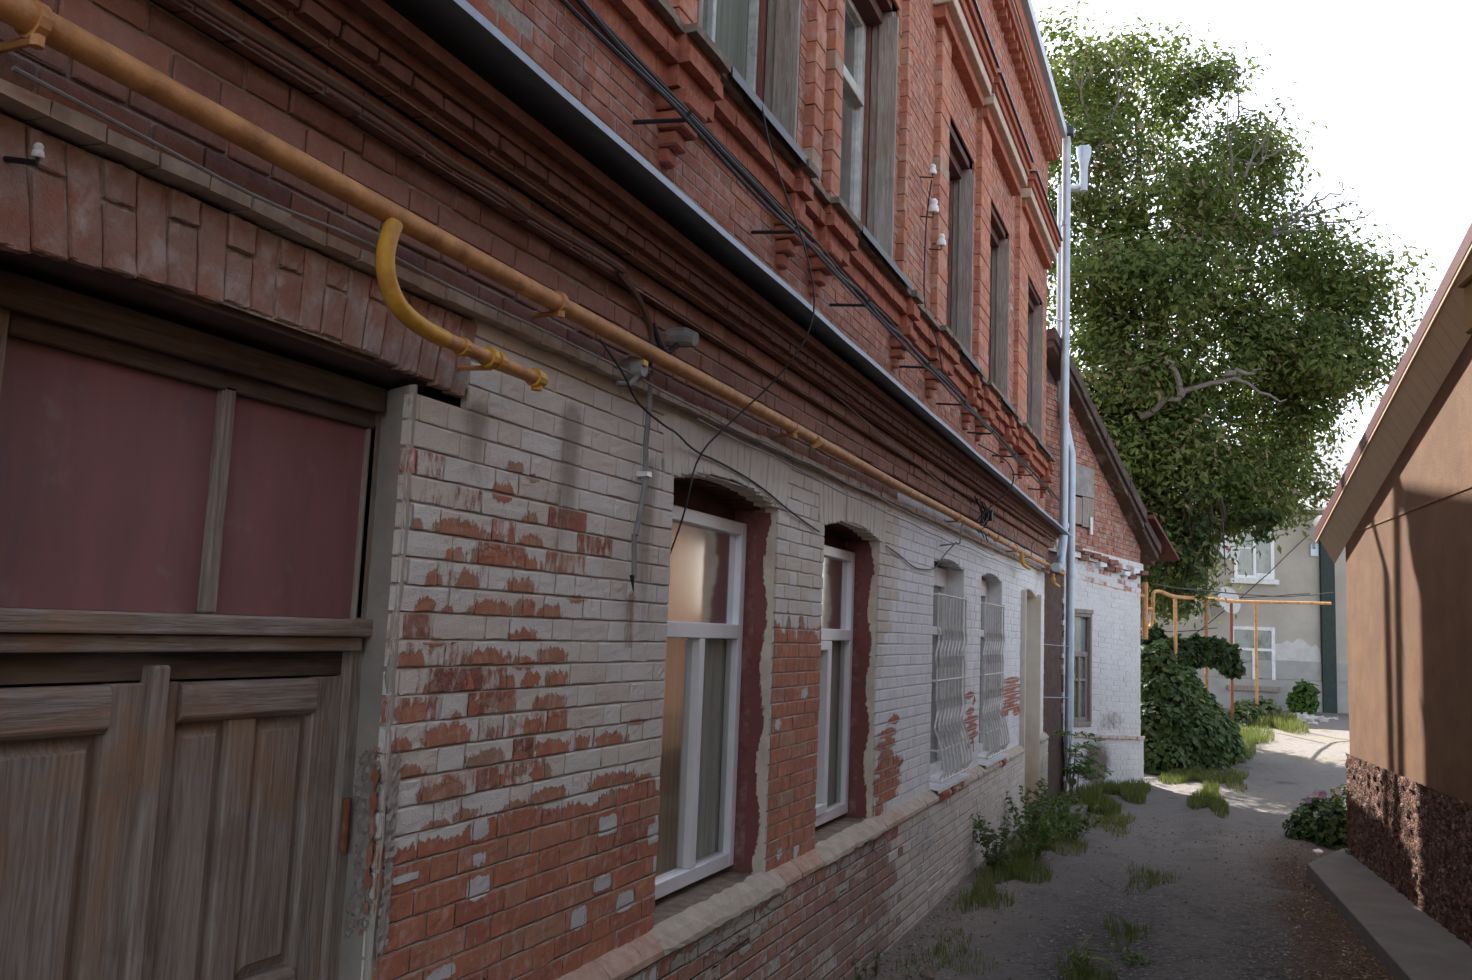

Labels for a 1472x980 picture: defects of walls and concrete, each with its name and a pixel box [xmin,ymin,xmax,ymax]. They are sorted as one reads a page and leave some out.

peeling [491,460,540,504]
peeling [344,510,660,980]
peeling [765,612,821,872]
peeling [872,714,903,817]
peeling [1001,676,1020,717]